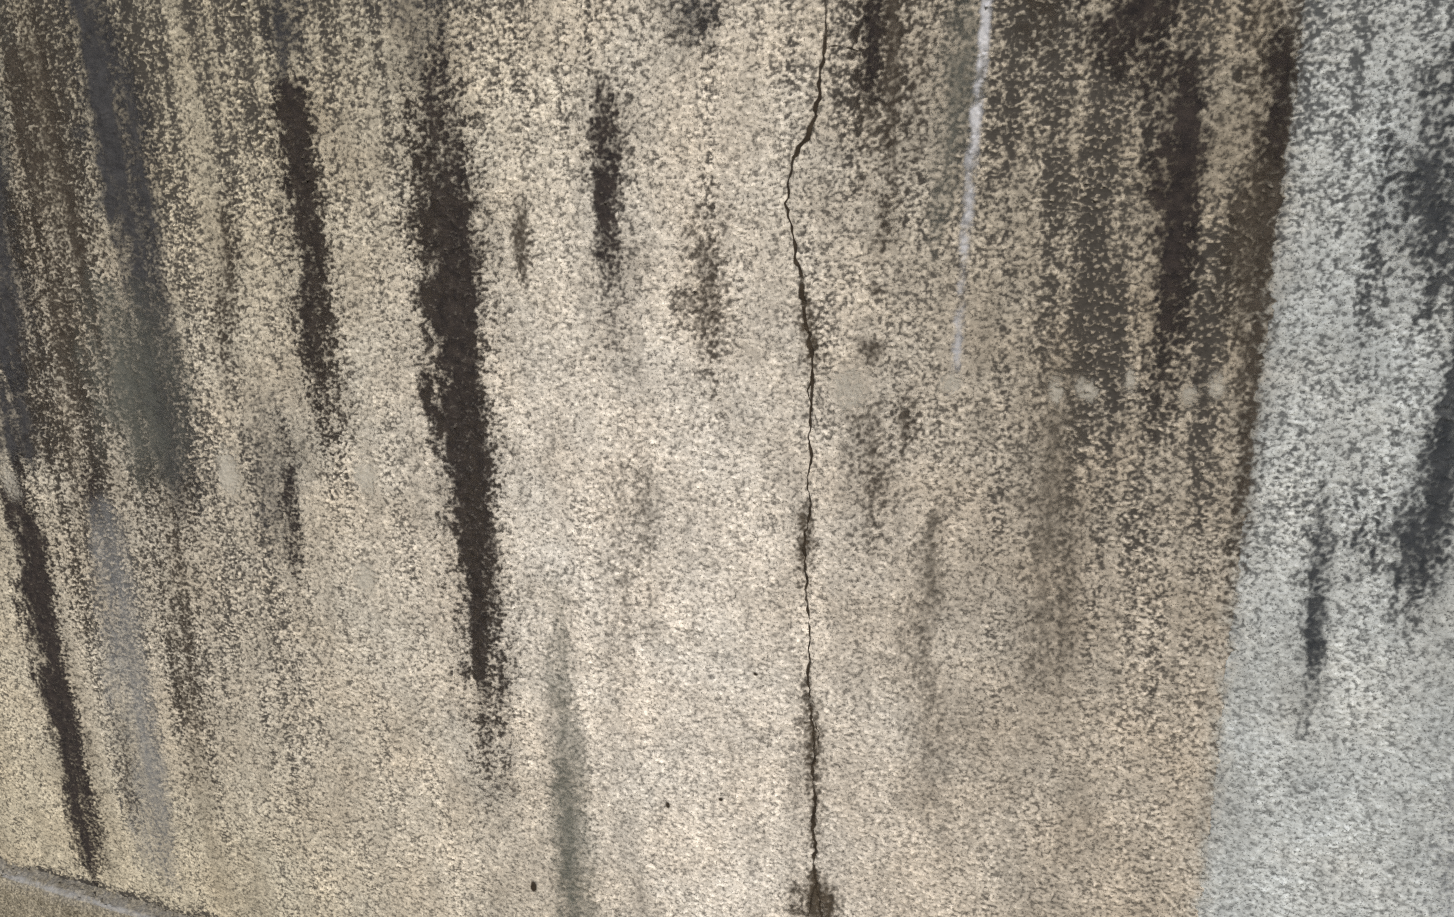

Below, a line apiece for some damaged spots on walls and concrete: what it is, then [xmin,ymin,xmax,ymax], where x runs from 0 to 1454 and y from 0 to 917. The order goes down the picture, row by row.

damp [0,0,203,886]
damp [272,0,341,442]
damp [400,33,510,771]
damp [583,82,631,317]
damp [673,206,728,376]
crack [784,0,870,917]
damp [852,0,918,252]
damp [948,0,991,259]
damp [1081,0,1208,379]
damp [1221,6,1296,565]
damp [1299,341,1454,706]
damp [1362,43,1454,317]